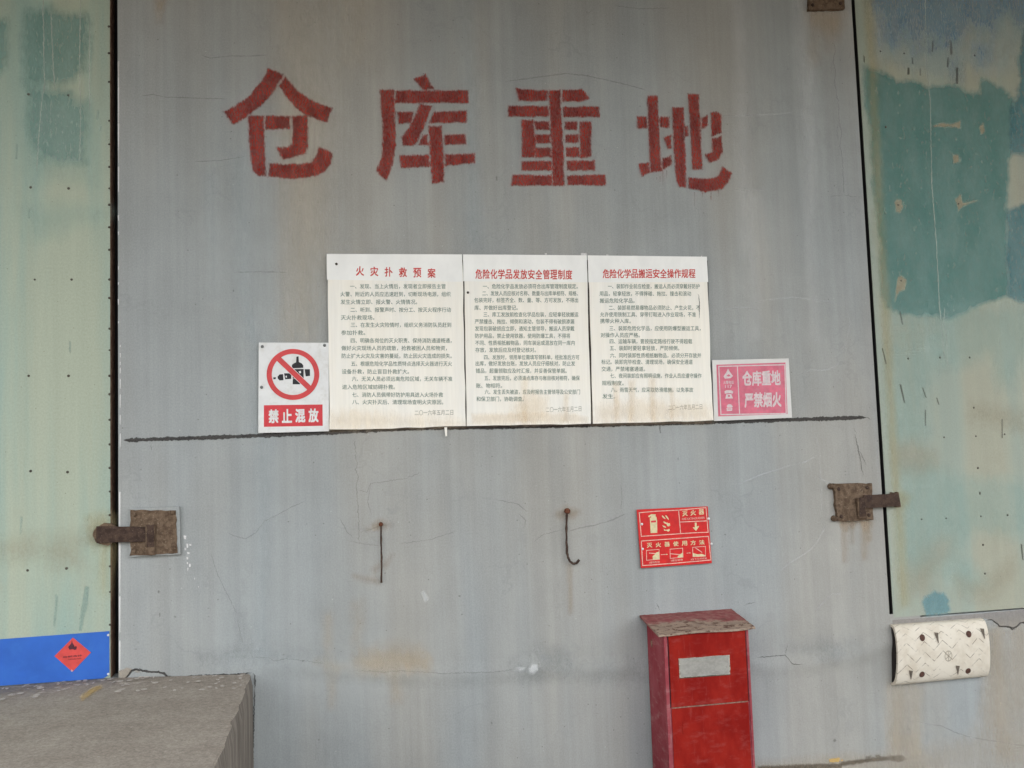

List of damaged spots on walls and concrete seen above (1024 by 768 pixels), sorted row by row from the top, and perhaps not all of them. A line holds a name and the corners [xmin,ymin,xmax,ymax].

peeling [865,36,1024,318]